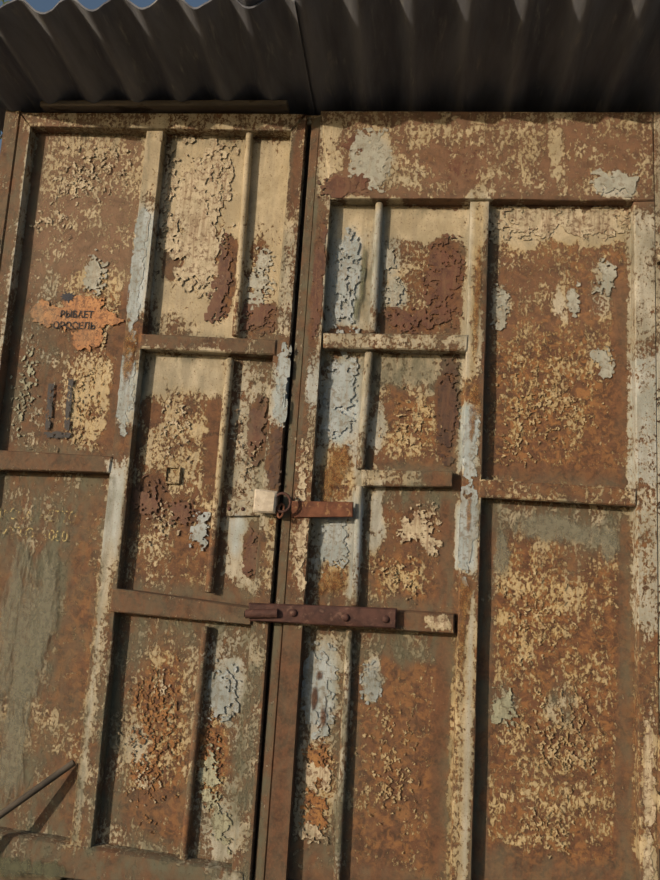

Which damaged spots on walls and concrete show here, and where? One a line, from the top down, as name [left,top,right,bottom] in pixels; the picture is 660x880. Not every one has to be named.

peeling [348,128,393,193]
peeling [115,135,239,437]
peeling [244,247,276,312]
peeling [330,227,365,333]
peeling [380,247,410,307]
peeling [273,342,292,428]
rust [436,354,480,466]
rust [324,446,349,502]
peeling [146,495,211,551]
rust [125,665,180,802]
rust [312,672,326,725]
rust [298,738,334,836]